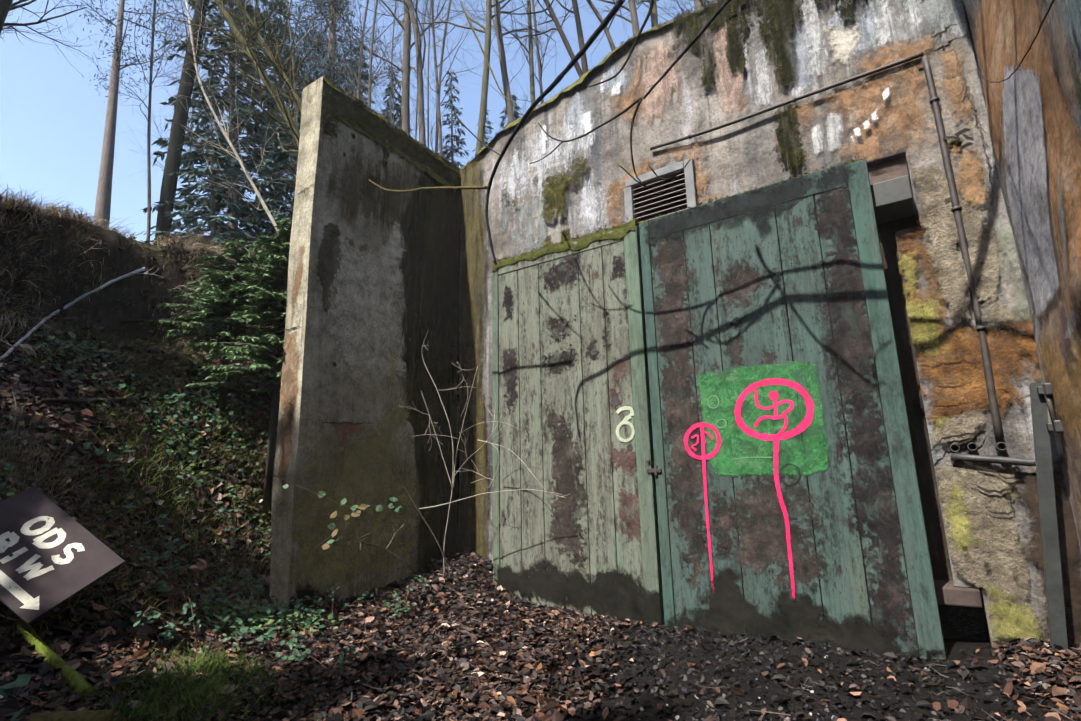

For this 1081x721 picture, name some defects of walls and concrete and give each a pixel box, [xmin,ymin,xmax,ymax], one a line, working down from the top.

damp [600,64,631,95]
damp [755,50,772,105]
damp [812,113,856,154]
damp [499,92,605,257]
damp [579,179,612,233]
damp [317,170,460,570]